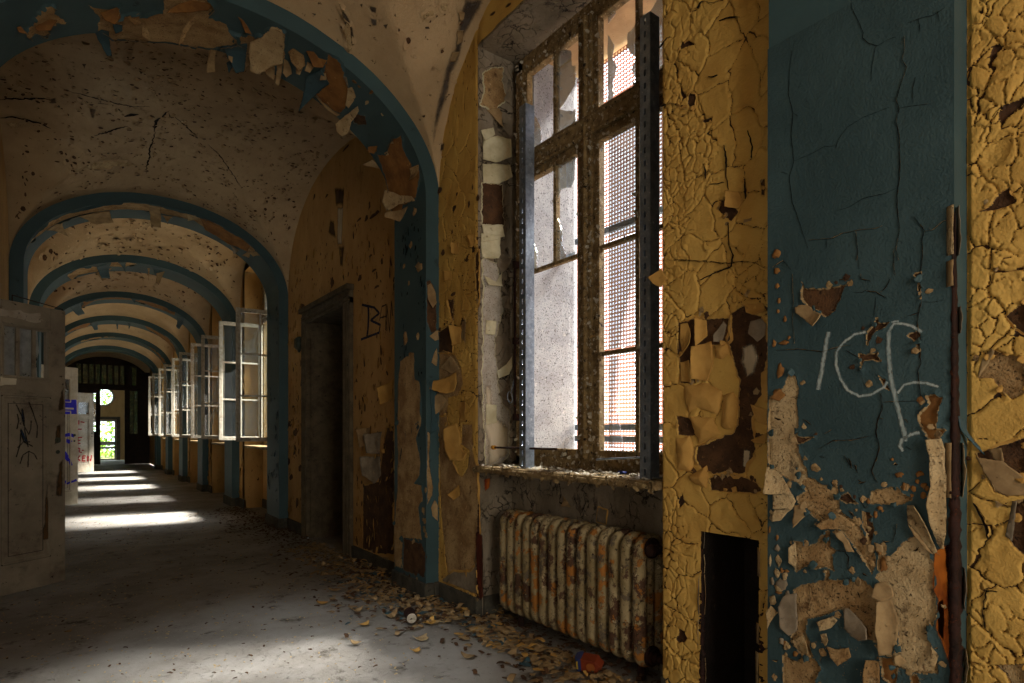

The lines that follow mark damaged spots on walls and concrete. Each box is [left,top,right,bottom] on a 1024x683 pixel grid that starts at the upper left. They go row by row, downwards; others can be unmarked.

crack [696,0,738,21]
crack [0,90,238,183]
peeling [0,0,373,343]
crack [703,130,753,199]
peeling [979,187,1016,213]
peeling [267,0,654,602]
crack [663,223,793,282]
crack [775,4,947,516]
peeling [675,249,947,683]